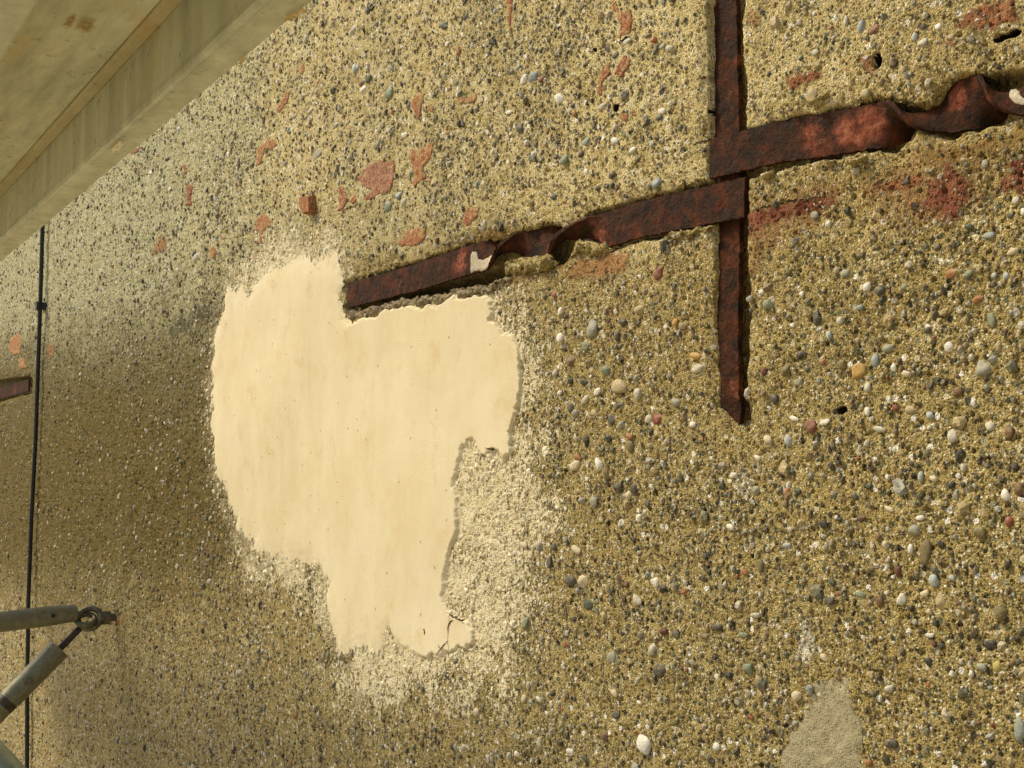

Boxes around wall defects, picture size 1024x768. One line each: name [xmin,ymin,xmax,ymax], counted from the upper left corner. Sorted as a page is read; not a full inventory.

rust [956,0,1017,32]
rust [785,70,821,91]
rust [875,131,1024,221]
spalling [571,239,615,257]
rust [558,253,628,279]
spalling [579,179,694,219]
spalling [665,225,718,240]
rust [748,195,834,241]
spalling [349,254,559,320]
peeling [448,614,475,652]